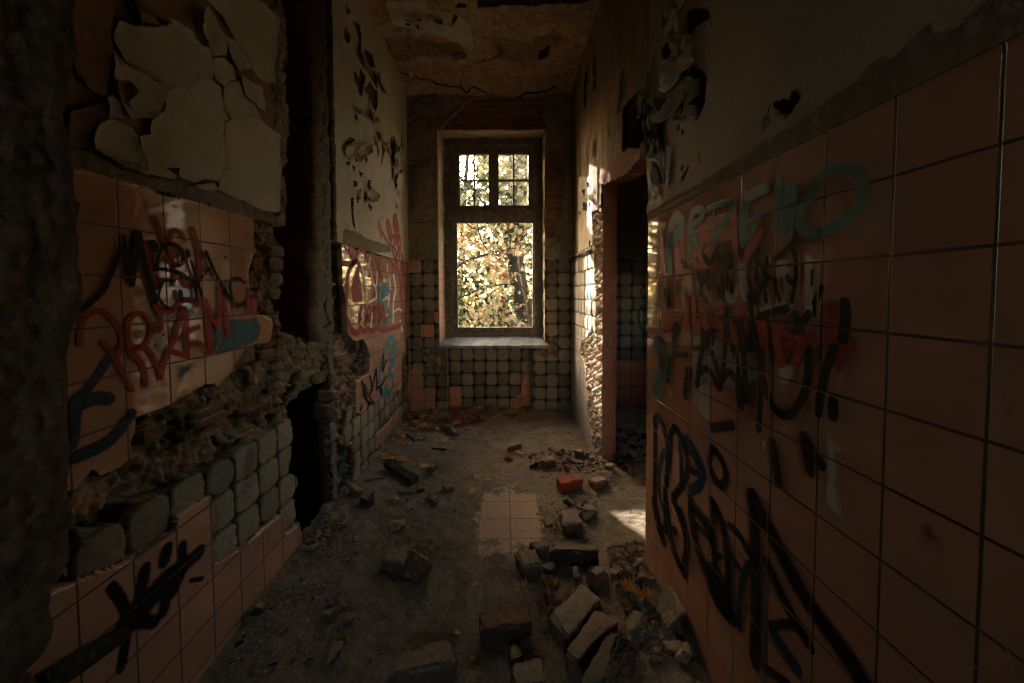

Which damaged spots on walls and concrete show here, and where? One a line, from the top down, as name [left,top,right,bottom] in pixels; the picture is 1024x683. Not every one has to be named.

crack [400,52,503,130]
peeling [636,0,710,186]
peeling [773,90,801,120]
peeling [59,0,607,580]